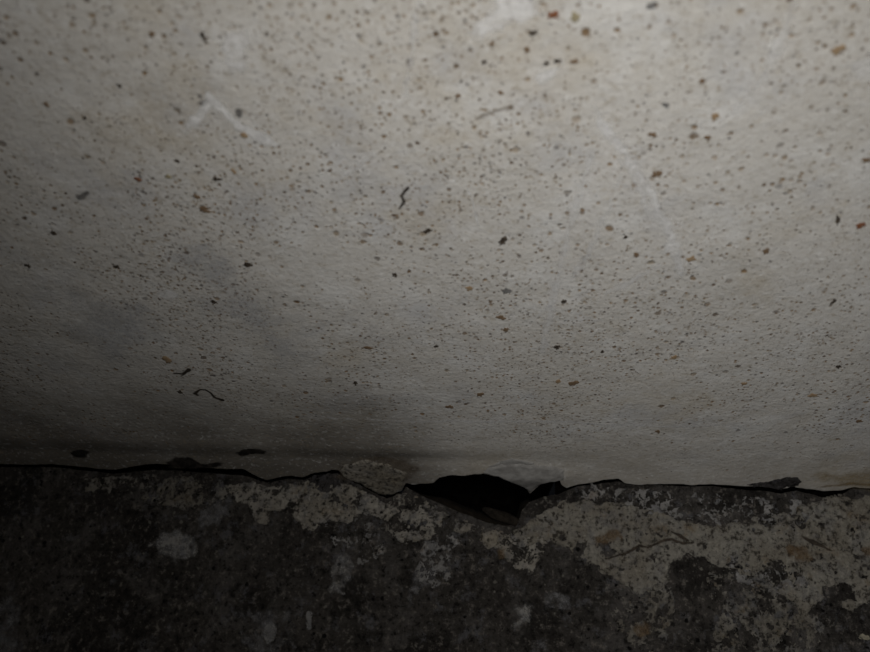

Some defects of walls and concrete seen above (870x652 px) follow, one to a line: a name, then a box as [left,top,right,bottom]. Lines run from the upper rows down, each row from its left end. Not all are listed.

crack [0,464,401,498]
crack [555,479,870,497]
spalling [85,457,870,652]